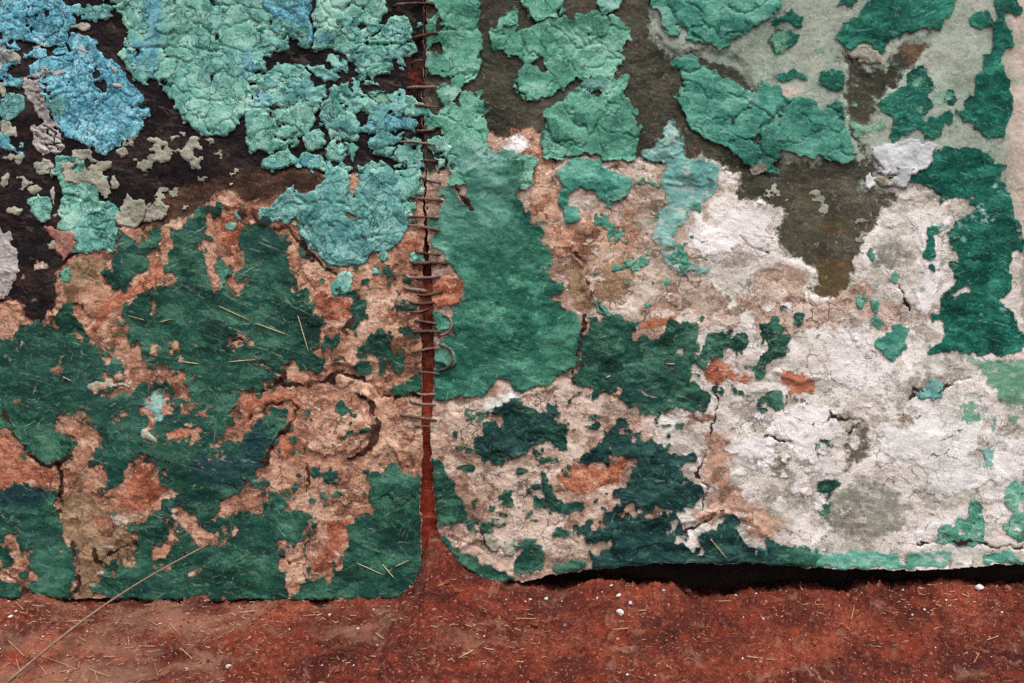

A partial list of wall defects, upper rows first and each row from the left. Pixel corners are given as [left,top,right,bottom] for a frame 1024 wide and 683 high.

peeling [923,222,945,272]
rust [418,279,437,368]
water stain [736,282,771,317]
crack [249,369,420,466]
peeling [752,370,818,422]
water stain [769,457,790,477]
peeling [797,424,886,520]
water stain [844,422,869,472]
water stain [808,485,969,549]
peeling [937,479,1024,547]
peeling [441,535,516,583]
peeling [812,548,952,570]